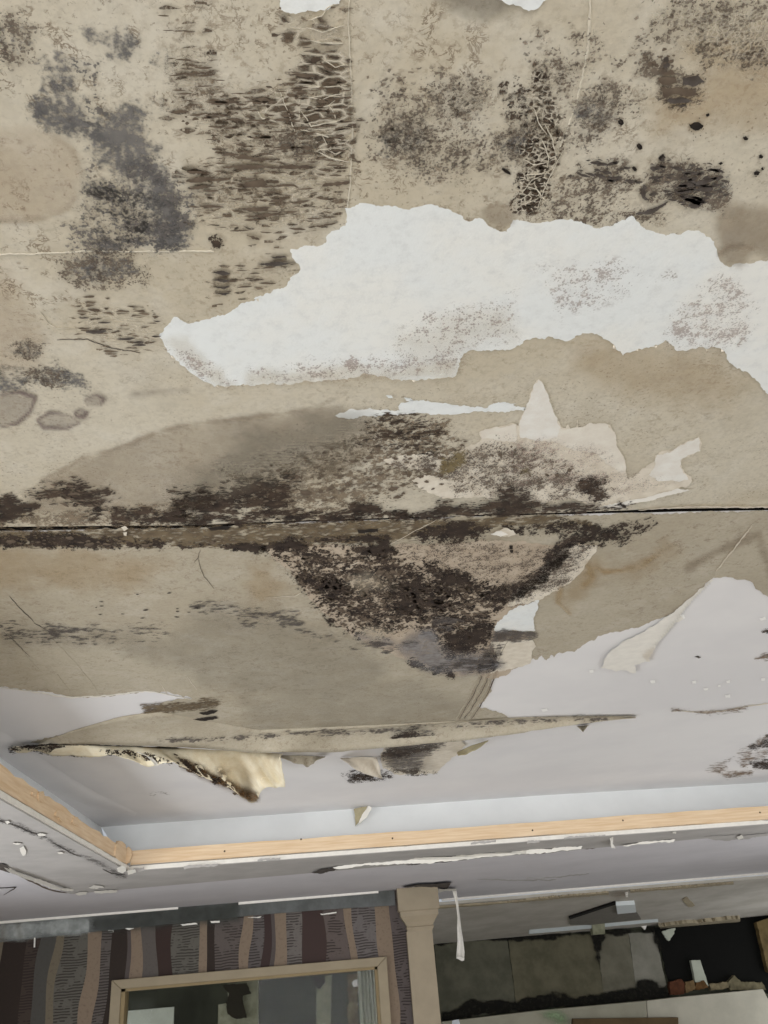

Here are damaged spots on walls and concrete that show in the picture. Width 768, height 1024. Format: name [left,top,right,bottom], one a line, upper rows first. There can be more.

damp [0,11,197,291]
crack [158,1,365,307]
crack [498,61,566,216]
damp [365,0,768,226]
peeling [159,203,768,394]
crack [167,526,231,618]
damp [0,410,658,680]
peeling [494,600,539,632]
peeling [336,379,702,509]
crack [640,504,768,512]
peeling [9,744,326,803]
peeling [340,757,382,779]